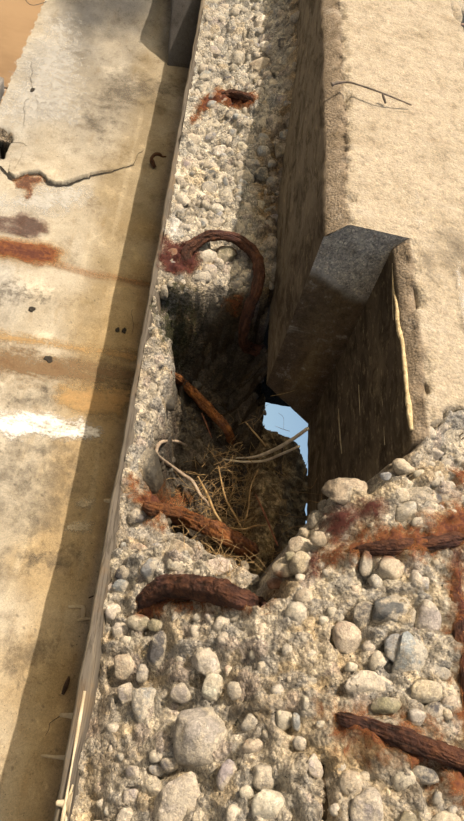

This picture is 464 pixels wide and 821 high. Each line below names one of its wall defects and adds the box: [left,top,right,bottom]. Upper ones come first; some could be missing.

corrosion [190,87,259,124]
spalling [0,128,13,155]
corrosion [15,174,42,199]
crack [0,152,141,187]
corrosion [0,215,63,267]
corrosion [157,234,200,275]
spalling [115,0,299,614]
corrosion [125,471,192,532]
corrosion [308,497,464,634]
corrosion [139,599,252,619]
spalling [70,409,464,821]
corrosion [331,705,464,805]